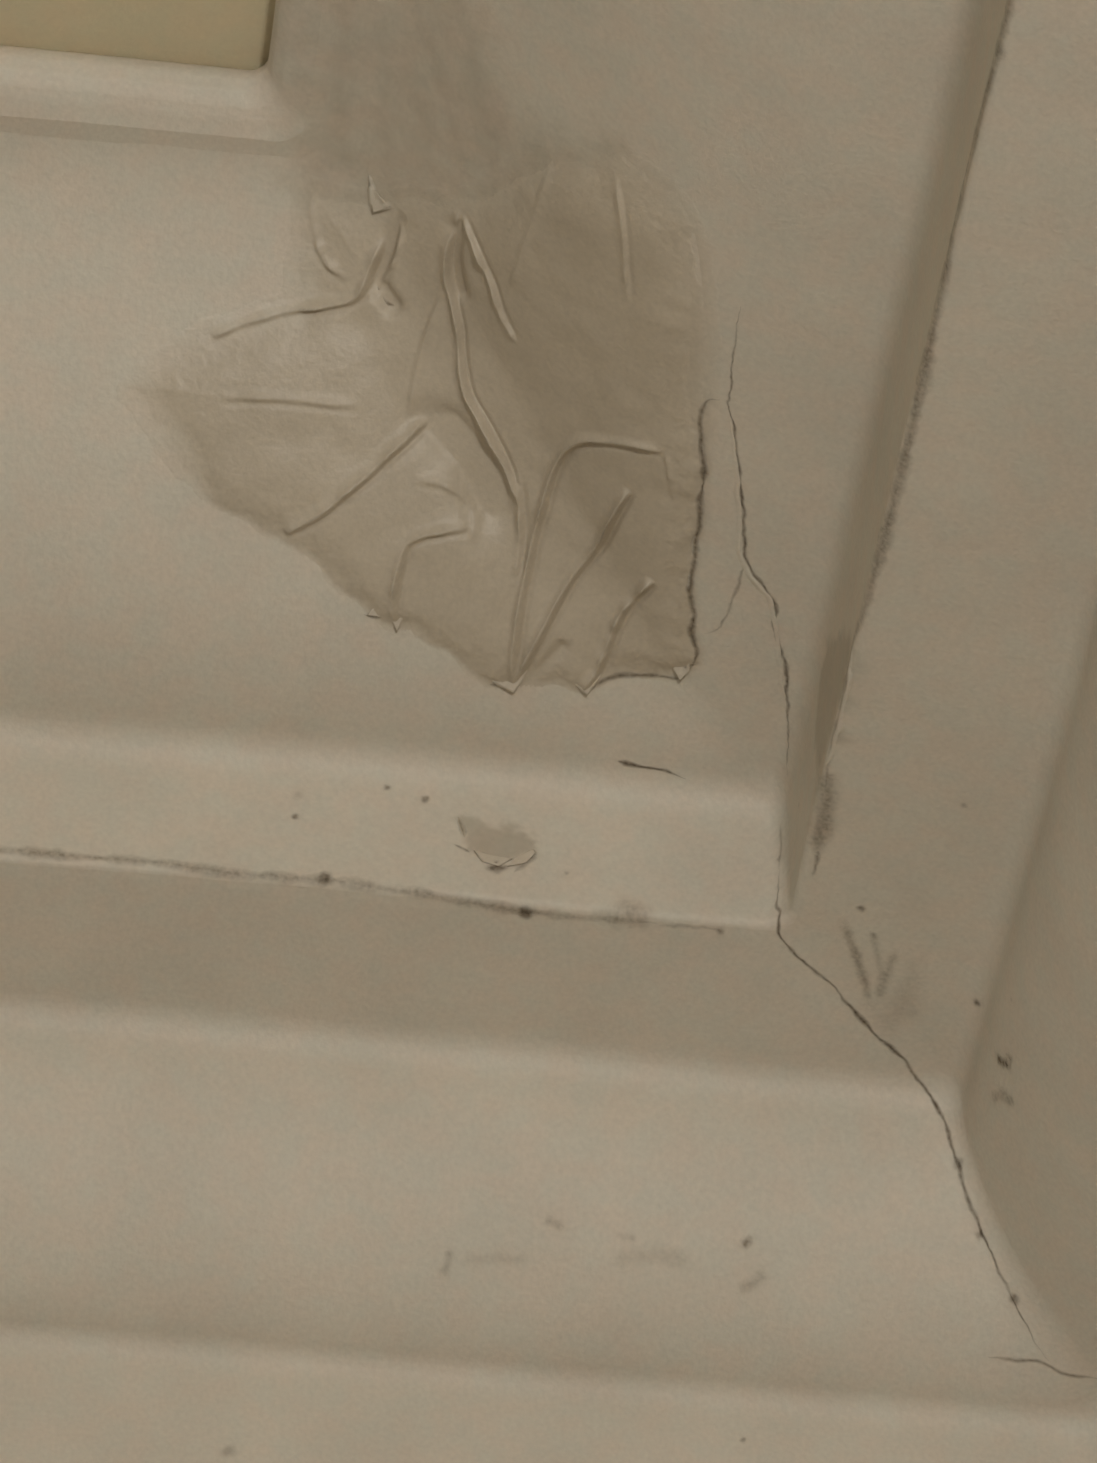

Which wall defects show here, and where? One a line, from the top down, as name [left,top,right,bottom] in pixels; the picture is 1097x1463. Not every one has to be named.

crack [778,915,960,1167]